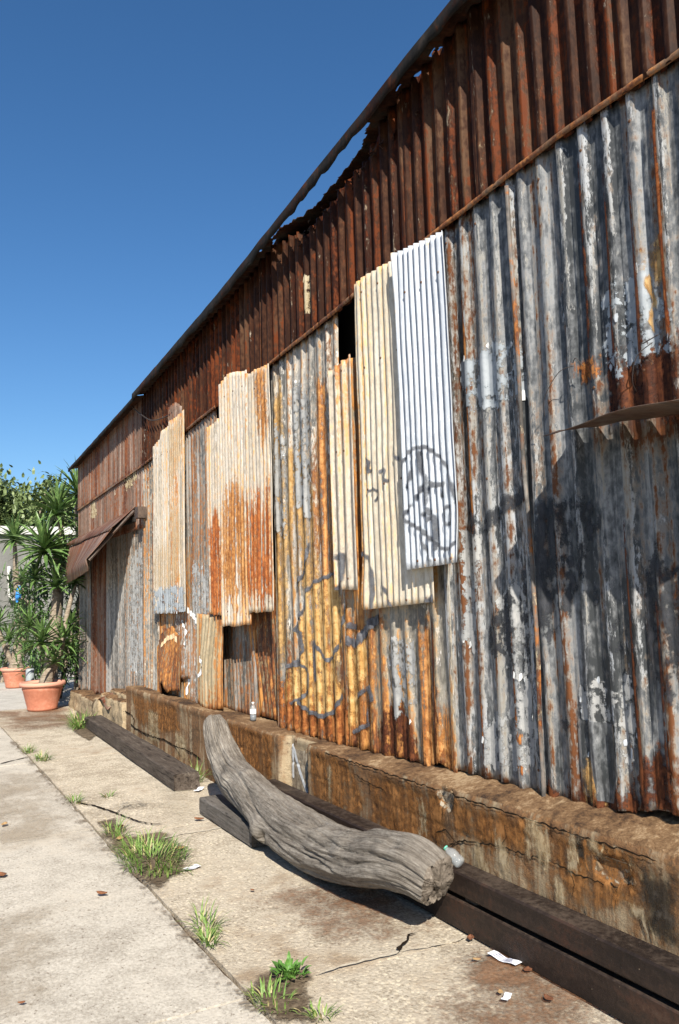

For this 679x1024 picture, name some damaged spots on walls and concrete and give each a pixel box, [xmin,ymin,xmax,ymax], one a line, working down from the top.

corrosion [574,110,679,425]
peeling [601,257,672,380]
corrosion [208,367,334,659]
crack [125,711,200,760]
corrosion [229,607,529,862]
peeling [482,581,536,774]
peeling [579,673,637,771]
corrosion [546,523,679,815]
crack [78,802,220,839]
crack [324,752,655,898]
corrosion [557,838,637,912]
crack [317,932,467,974]